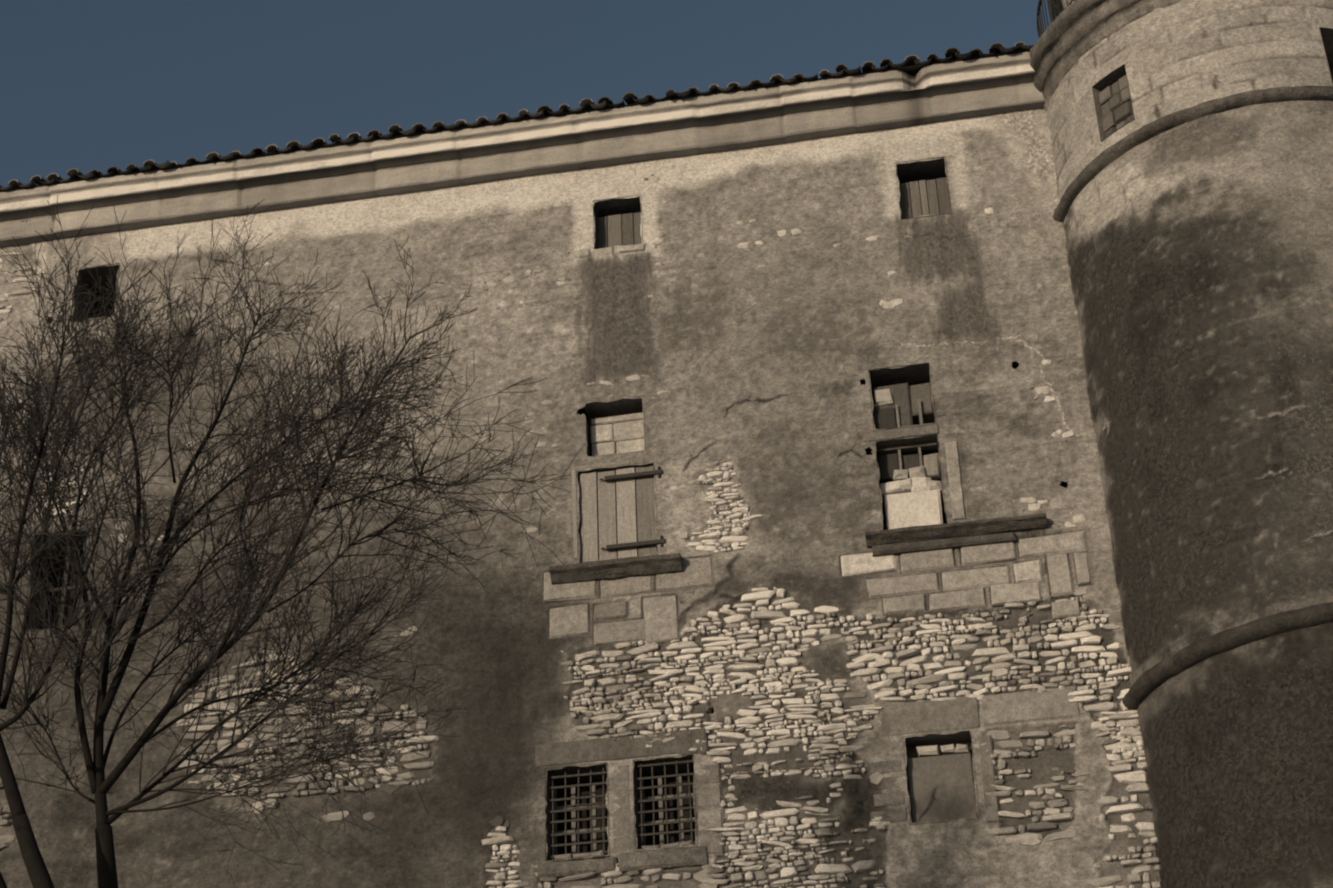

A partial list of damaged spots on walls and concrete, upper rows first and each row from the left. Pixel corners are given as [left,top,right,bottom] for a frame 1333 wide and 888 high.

spalling [0,248,42,322]
leakage [582,253,651,383]
spalling [41,467,89,520]
spalling [678,461,763,552]
leakage [1068,188,1333,667]
spalling [176,644,439,822]
spalling [481,587,1161,888]
leakage [1143,622,1333,888]